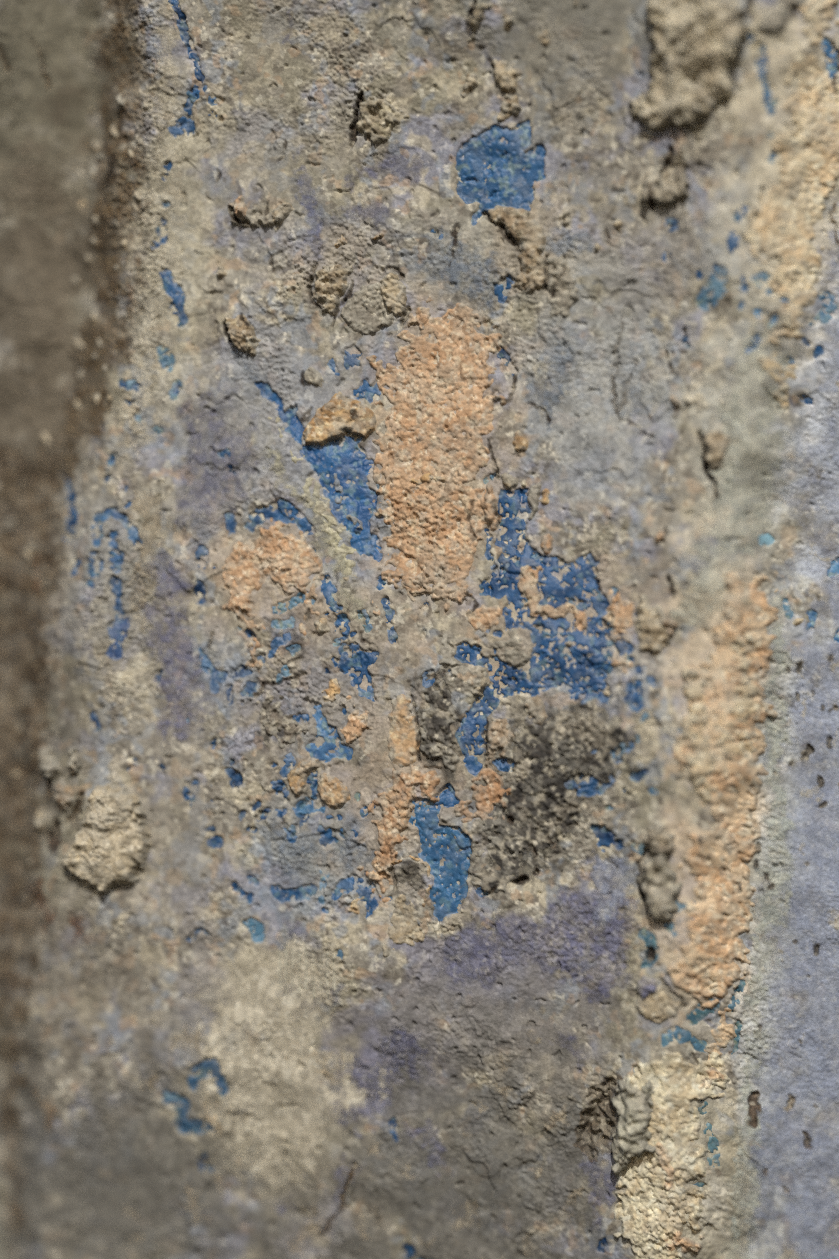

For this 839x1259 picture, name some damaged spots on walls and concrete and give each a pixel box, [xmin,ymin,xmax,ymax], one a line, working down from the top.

flaking render [742,0,839,411]
flaking render [221,296,550,672]
crack [698,433,719,498]
peeling [193,580,206,604]
flaking render [517,534,634,647]
flaking render [321,678,373,745]
spalling [789,737,832,766]
flaking render [611,572,804,1259]